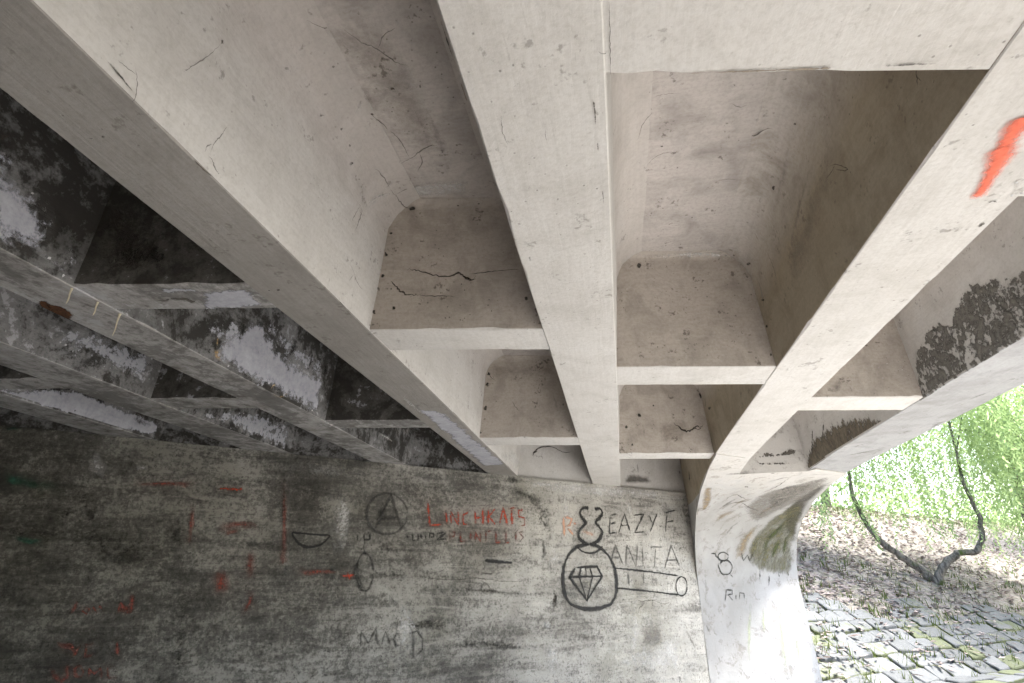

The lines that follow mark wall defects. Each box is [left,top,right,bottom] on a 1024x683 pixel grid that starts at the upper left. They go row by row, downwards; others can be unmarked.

crack [392,268,517,297]
crack [674,395,713,445]
leakage [720,479,823,557]